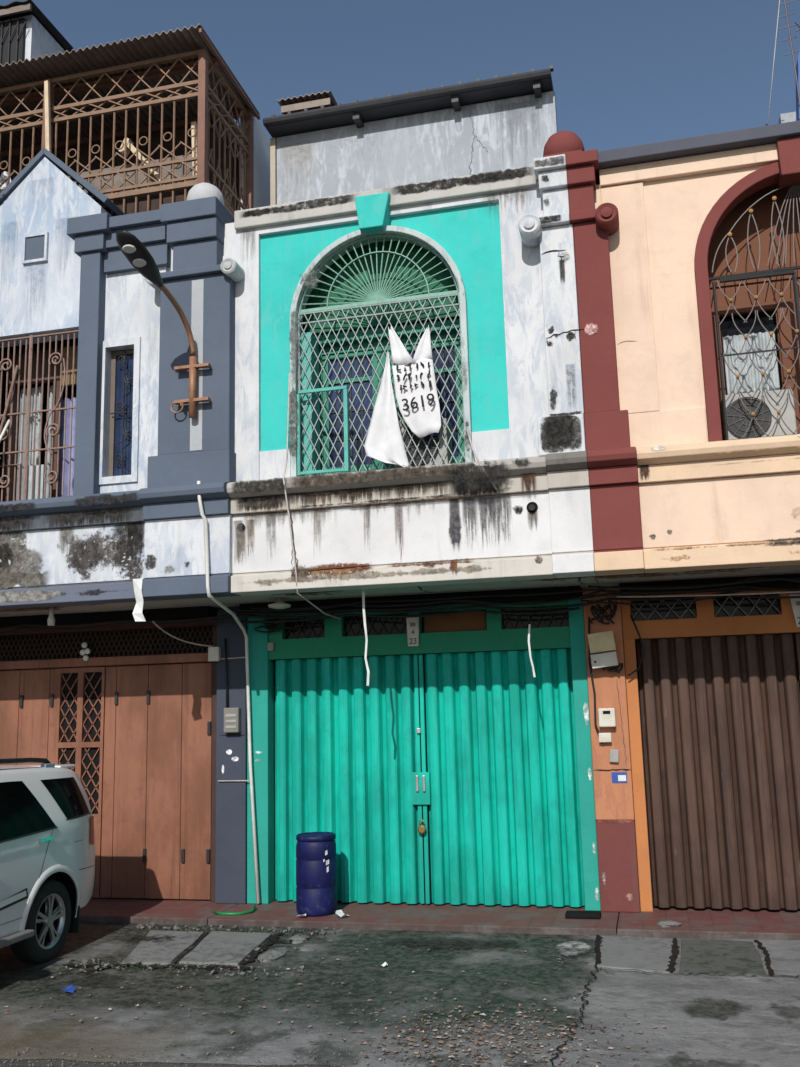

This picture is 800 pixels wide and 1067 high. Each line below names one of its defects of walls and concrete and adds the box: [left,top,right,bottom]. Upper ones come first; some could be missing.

crack [469,110,488,175]
leakage [395,156,564,202]
leakage [243,194,351,217]
leakage [539,199,560,223]
leakage [541,364,581,453]
leakage [233,421,535,557]
leakage [0,502,34,532]
leakage [49,492,189,581]
leakage [257,564,490,596]
rust [391,558,470,572]